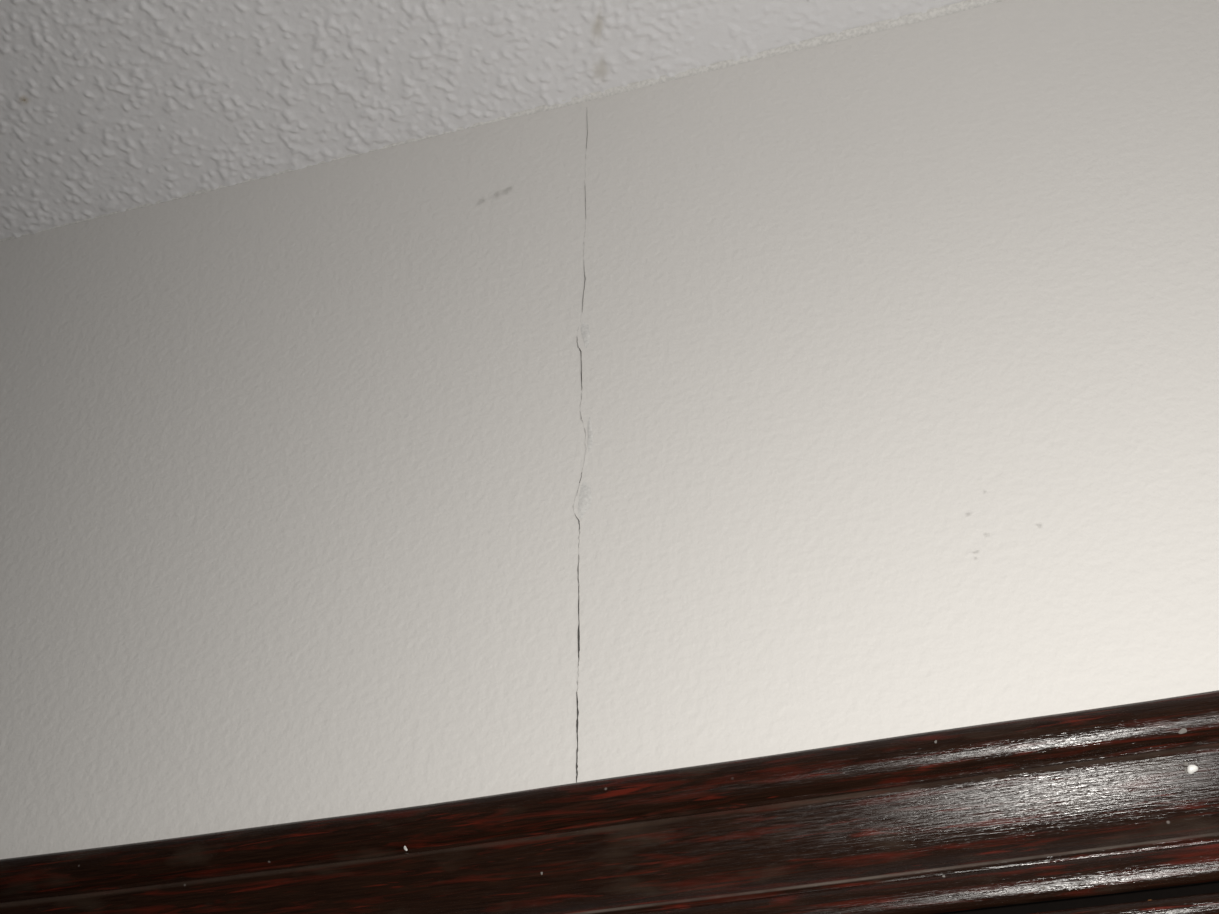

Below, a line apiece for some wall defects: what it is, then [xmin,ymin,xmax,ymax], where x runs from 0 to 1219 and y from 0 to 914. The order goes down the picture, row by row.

crack [577,272,593,529]
crack [575,562,583,665]
crack [573,698,581,783]